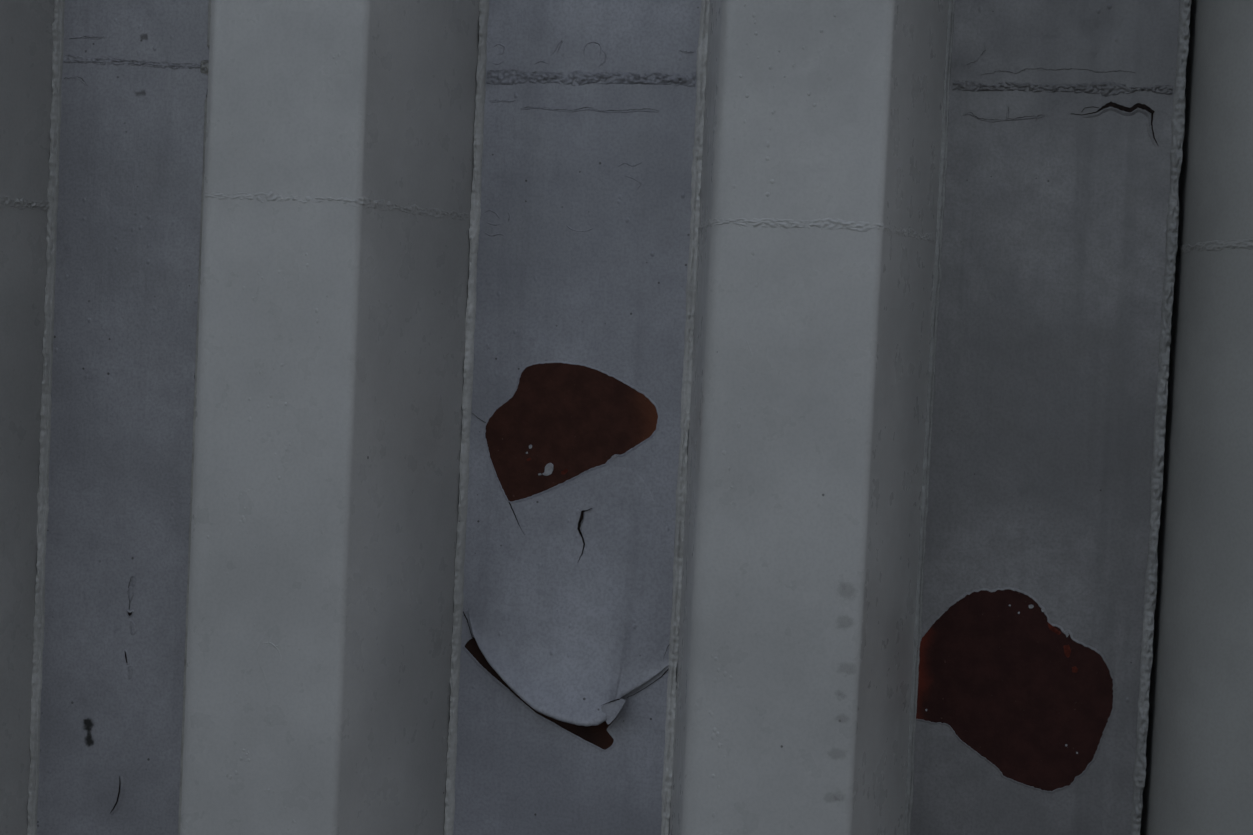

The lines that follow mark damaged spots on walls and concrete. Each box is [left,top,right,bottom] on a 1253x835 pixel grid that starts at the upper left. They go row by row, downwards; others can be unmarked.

crack [962,50,1158,147]
crack [577,508,592,562]